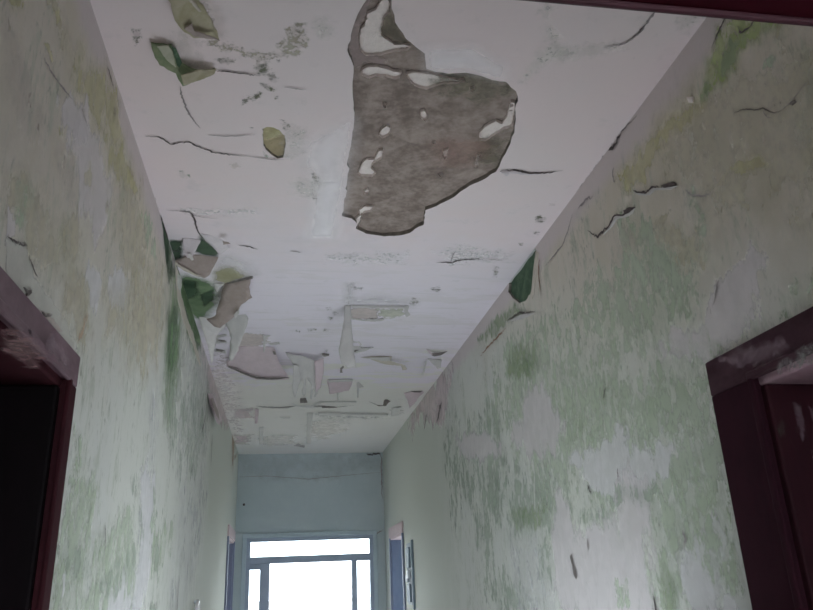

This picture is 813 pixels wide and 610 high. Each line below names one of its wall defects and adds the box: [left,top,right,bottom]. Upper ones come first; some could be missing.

water stain [78,69,244,479]
peeling [151,42,216,86]
peeling [168,0,220,41]
crack [147,86,284,160]
peeling [175,233,289,380]
mould [209,23,307,102]
spalling [342,0,518,236]
crack [500,168,556,176]
crack [545,117,636,266]
crack [589,182,713,238]
water stain [444,207,743,610]
water stain [53,437,173,610]